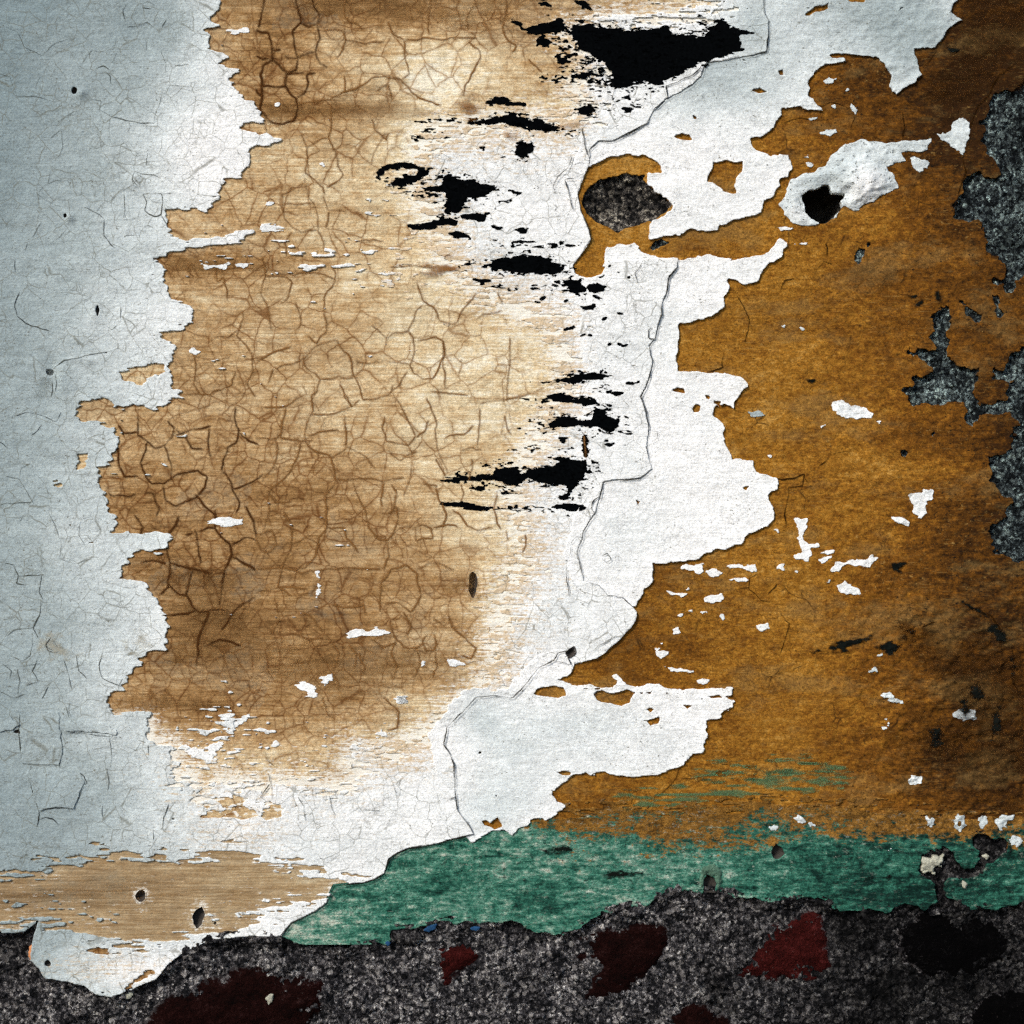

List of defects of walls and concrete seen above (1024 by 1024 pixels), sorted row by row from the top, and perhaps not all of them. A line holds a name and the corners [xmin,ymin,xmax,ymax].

crack [1,26,169,246]
crack [502,1,542,72]
crack [555,22,770,261]
crack [109,0,520,712]
peeling [75,0,743,820]
crack [566,258,679,607]
peeling [552,0,1024,832]
crack [737,573,790,653]
peeling [0,710,85,811]
peeling [482,818,502,831]
flaking render [0,830,1024,1024]